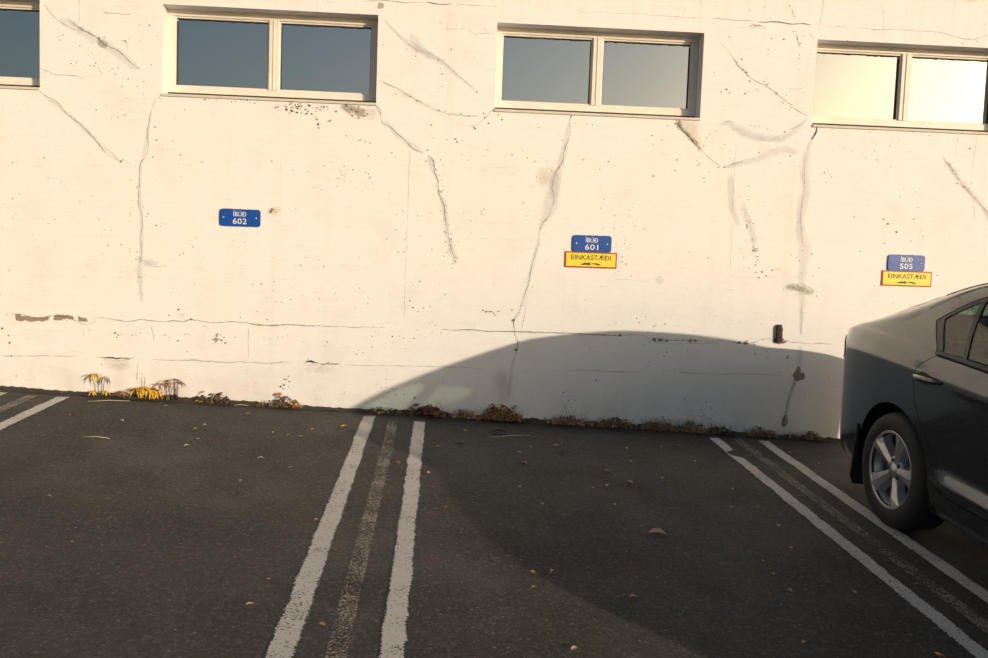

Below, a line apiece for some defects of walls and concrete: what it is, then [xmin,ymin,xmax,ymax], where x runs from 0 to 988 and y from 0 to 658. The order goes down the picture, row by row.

crack [45,5,139,69]
crack [41,71,162,295]
crack [107,309,377,332]
crack [376,37,503,269]
crack [444,115,637,358]
crack [713,43,832,255]